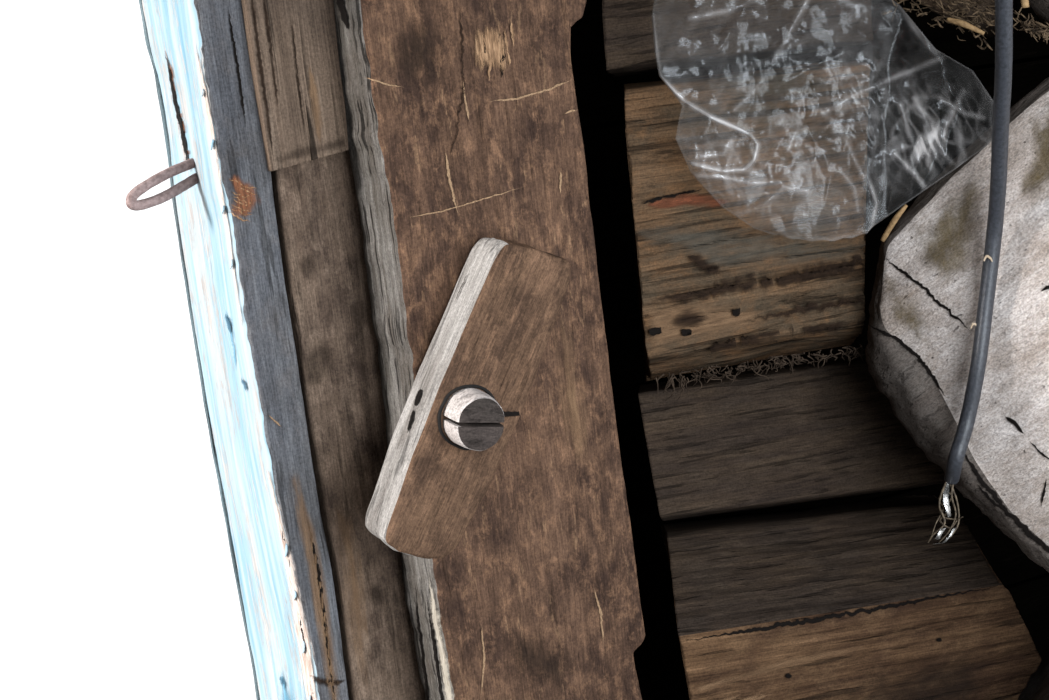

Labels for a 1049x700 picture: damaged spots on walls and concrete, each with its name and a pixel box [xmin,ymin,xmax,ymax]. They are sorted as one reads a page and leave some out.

crack [886,258,969,330]
crack [687,585,998,640]